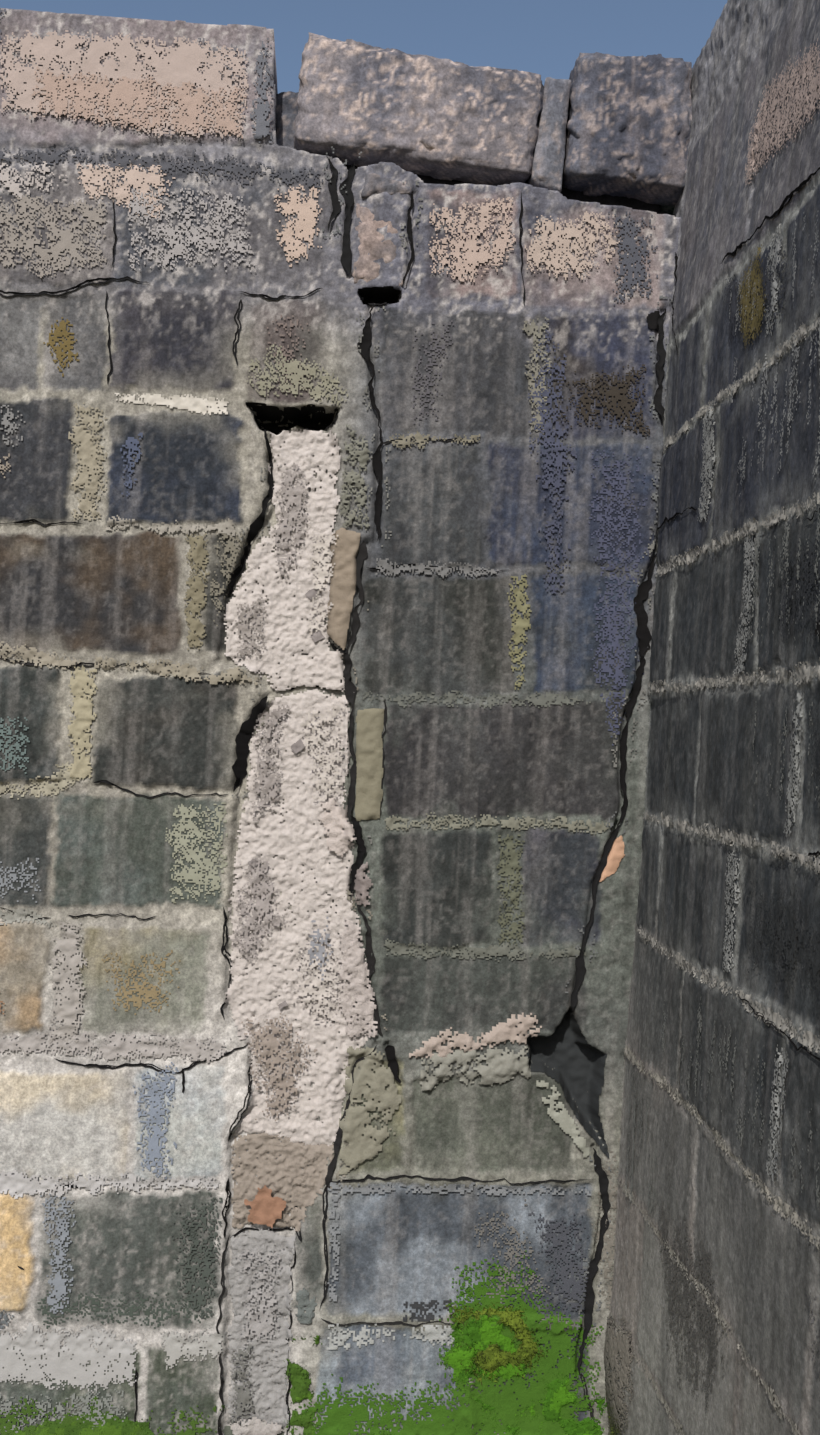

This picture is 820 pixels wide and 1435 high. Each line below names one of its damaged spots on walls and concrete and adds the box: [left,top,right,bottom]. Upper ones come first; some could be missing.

crack [0,180,149,385]
crack [232,159,355,366]
peeling [246,344,371,410]
crack [403,190,415,285]
crack [653,252,678,468]
peeling [210,520,270,626]
spalling [305,424,392,650]
spalling [291,739,305,753]
spalling [340,708,384,844]
crack [94,305,632,1435]
crack [570,506,697,1013]
crack [54,907,253,1141]